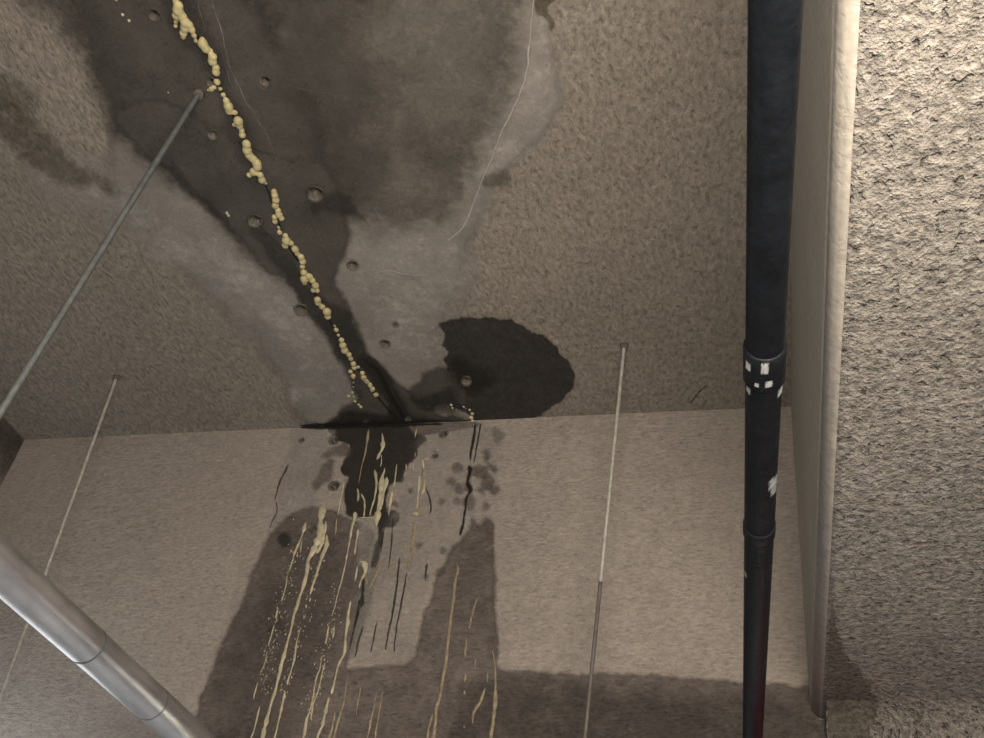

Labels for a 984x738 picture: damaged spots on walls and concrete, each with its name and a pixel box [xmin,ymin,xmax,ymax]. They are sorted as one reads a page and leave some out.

crack [195,6,317,297]
water stain [0,0,743,738]
crack [300,359,459,429]
water stain [763,602,877,738]